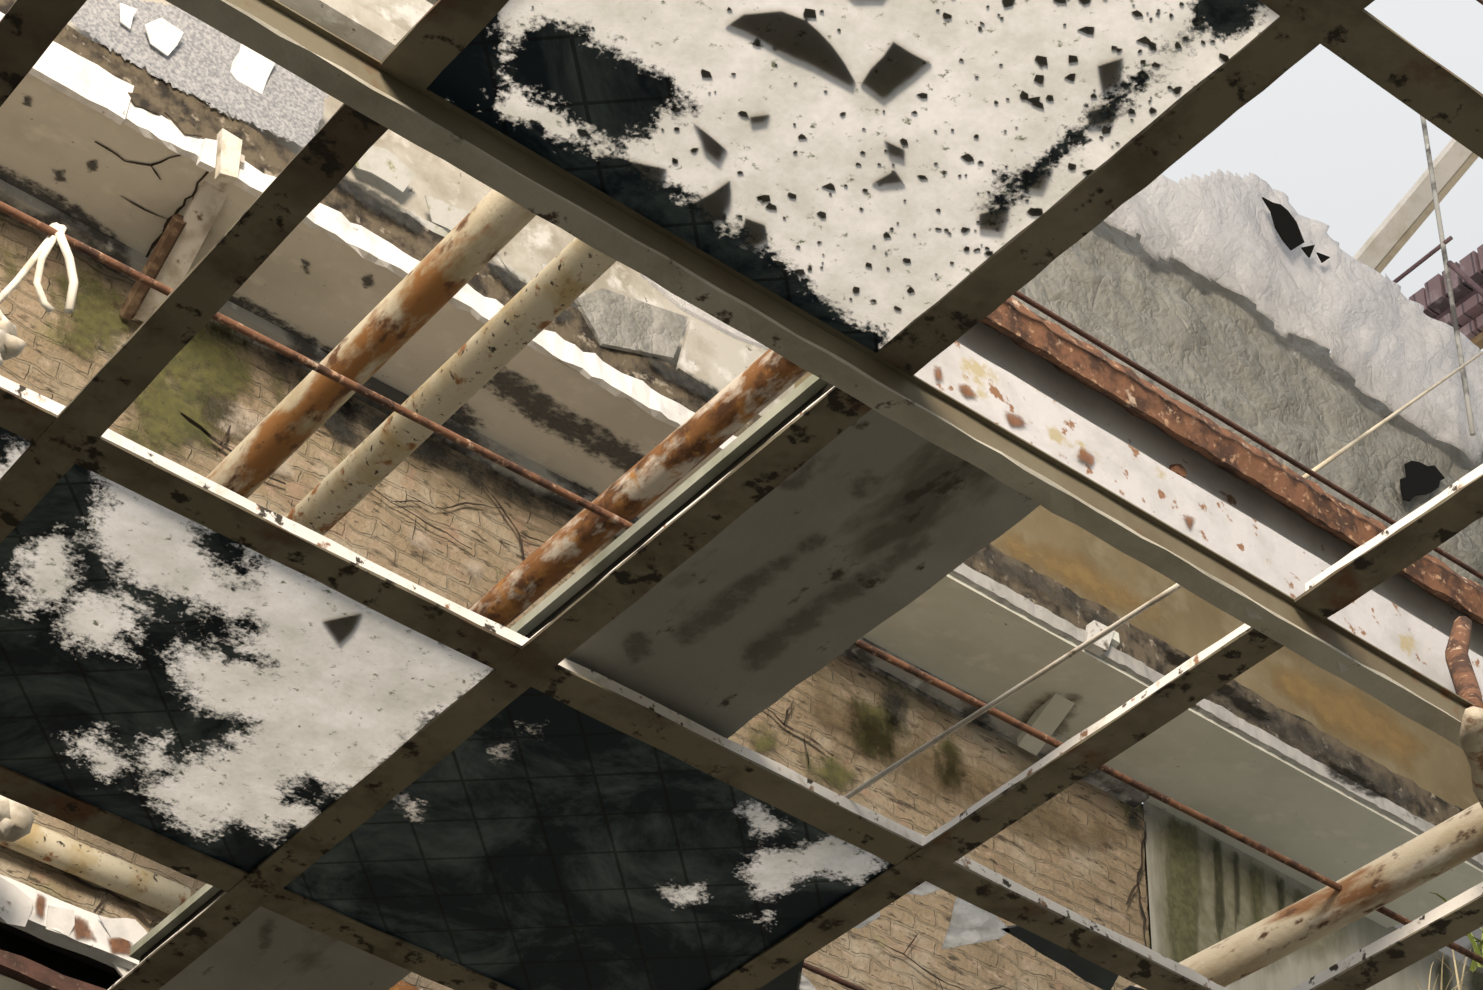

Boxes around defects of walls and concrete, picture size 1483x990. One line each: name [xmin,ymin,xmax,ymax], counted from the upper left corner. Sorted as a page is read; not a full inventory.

corrosion [959,385,976,396]
corrosion [1006,412,1026,426]
corrosion [1078,448,1094,465]